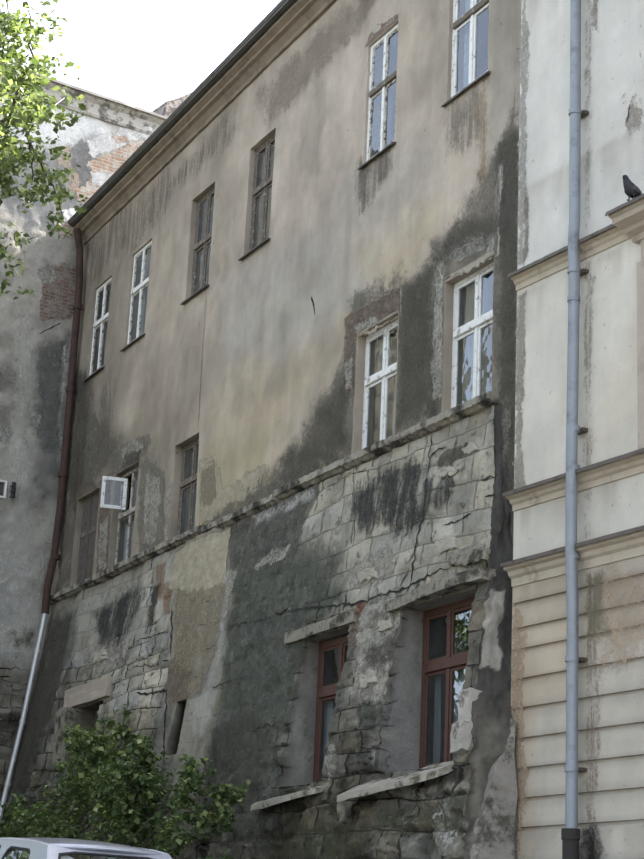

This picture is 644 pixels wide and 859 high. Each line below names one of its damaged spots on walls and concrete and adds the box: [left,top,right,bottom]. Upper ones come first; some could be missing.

flaking render [59,126,158,238]
leakage [212,108,519,549]
leakage [0,324,120,594]
spalling [436,441,480,477]
peeling [254,544,290,570]
crack [199,435,448,641]
spalling [434,537,491,581]
leakage [95,584,160,646]
crack [132,606,173,668]
spalling [346,541,402,731]
crack [136,688,167,767]
leakage [579,807,604,859]